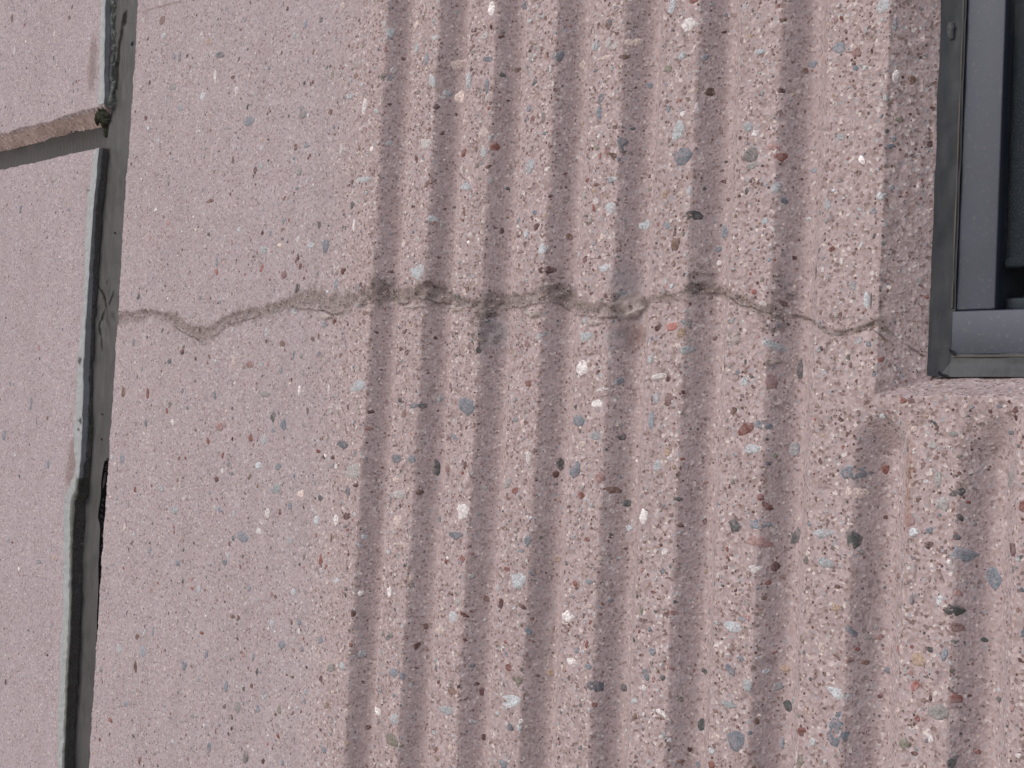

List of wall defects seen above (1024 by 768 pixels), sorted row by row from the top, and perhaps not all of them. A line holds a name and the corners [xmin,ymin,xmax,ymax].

crack [118,278,619,345]
crack [641,286,888,334]